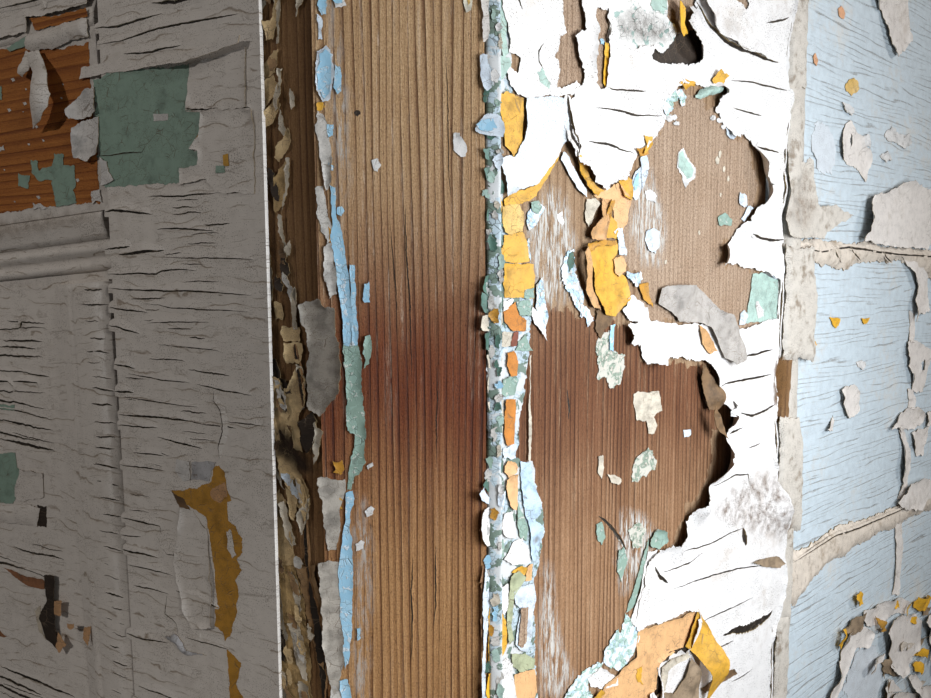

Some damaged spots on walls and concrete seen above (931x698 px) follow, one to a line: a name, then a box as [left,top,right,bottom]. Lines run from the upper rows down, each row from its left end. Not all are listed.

crack [94,0,239,58]
peeling [0,35,255,213]
crack [0,318,55,452]
crack [81,186,261,698]
peeling [261,0,341,698]
peeling [463,0,779,698]
peeling [864,180,931,511]
crack [0,542,64,570]
crack [0,665,75,698]
peeling [2,567,91,653]
peeling [172,391,243,698]
peeling [830,523,931,698]